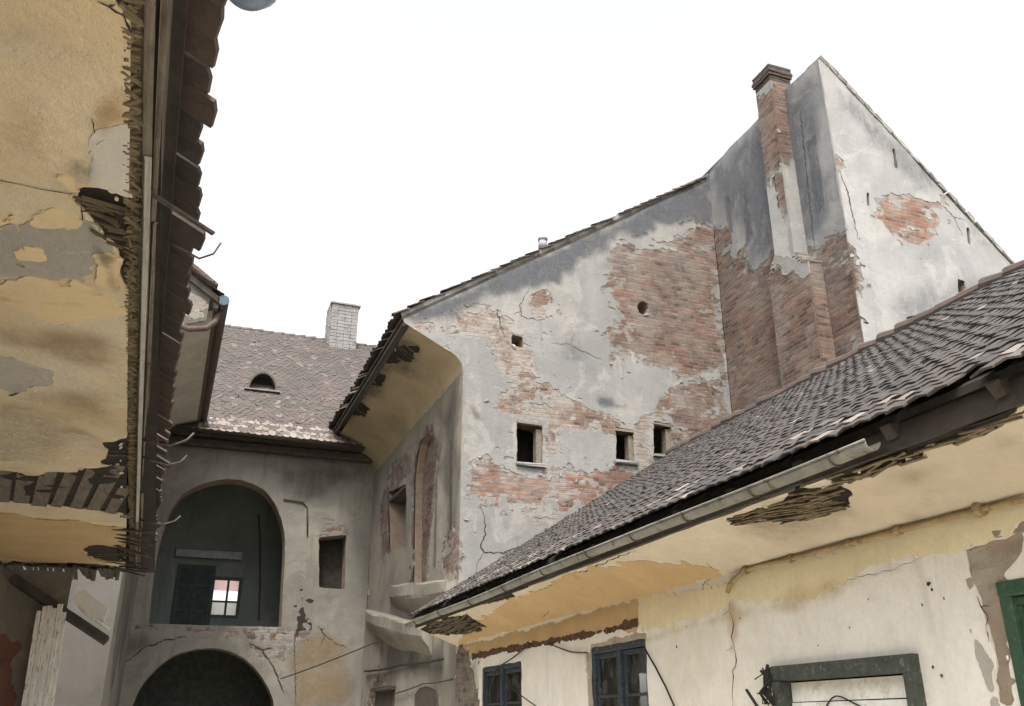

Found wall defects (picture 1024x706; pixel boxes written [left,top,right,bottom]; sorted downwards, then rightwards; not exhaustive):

flaking render [57,174,80,200]
flaking render [88,123,133,202]
flaking render [870,187,951,246]
flaking render [0,214,128,325]
crack [496,290,596,358]
flaking render [410,80,871,537]
crack [476,506,519,572]
peeling [455,503,1024,706]
crack [126,636,186,662]
crack [249,636,297,706]
crack [724,605,737,700]